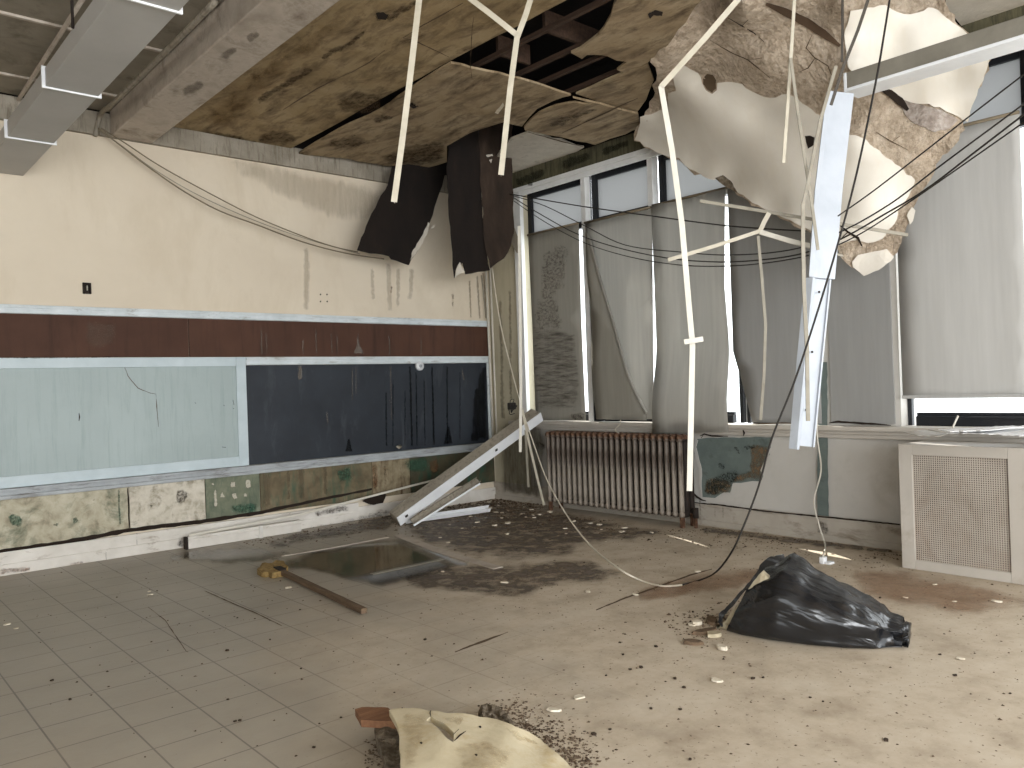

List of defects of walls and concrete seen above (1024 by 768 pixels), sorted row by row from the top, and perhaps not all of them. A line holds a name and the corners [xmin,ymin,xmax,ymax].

flaking render [902,100,958,132]
water stain [387,142,443,166]
flaking render [715,175,737,192]
flaking render [840,185,920,276]
peeling [693,437,772,499]
water stain [272,507,393,546]